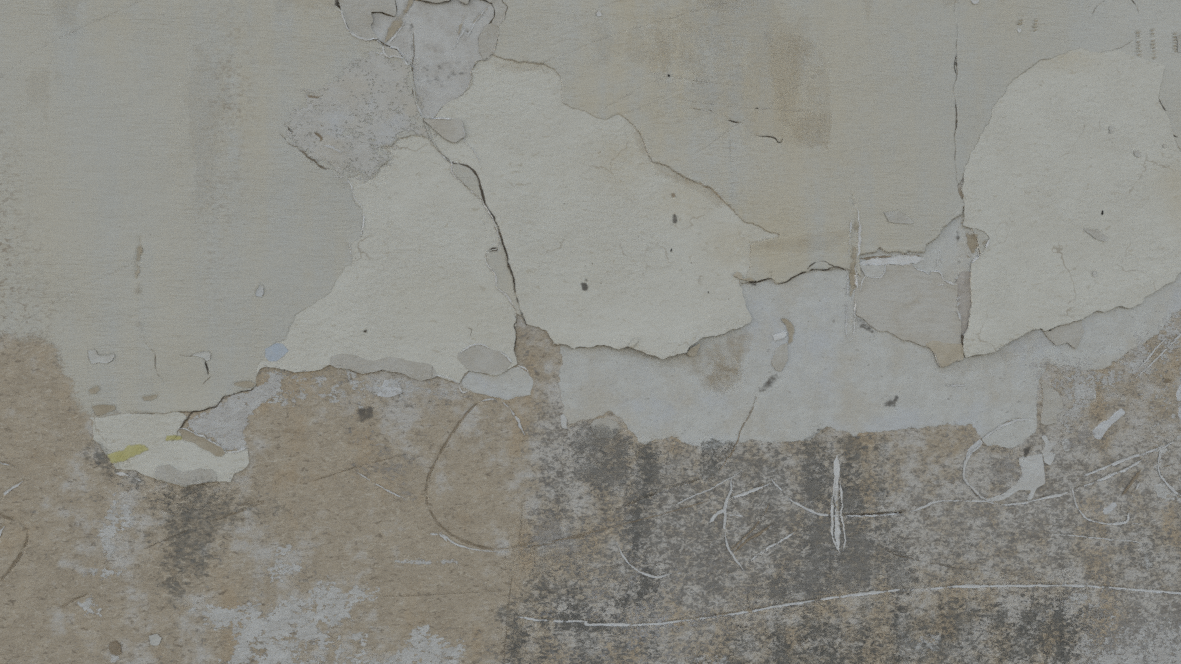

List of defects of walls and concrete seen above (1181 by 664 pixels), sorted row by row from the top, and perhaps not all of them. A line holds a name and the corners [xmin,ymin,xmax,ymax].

spalling [81,492,138,580]
peeling [108,641,121,663]
spalling [188,544,468,664]
spalling [1035,566,1181,664]